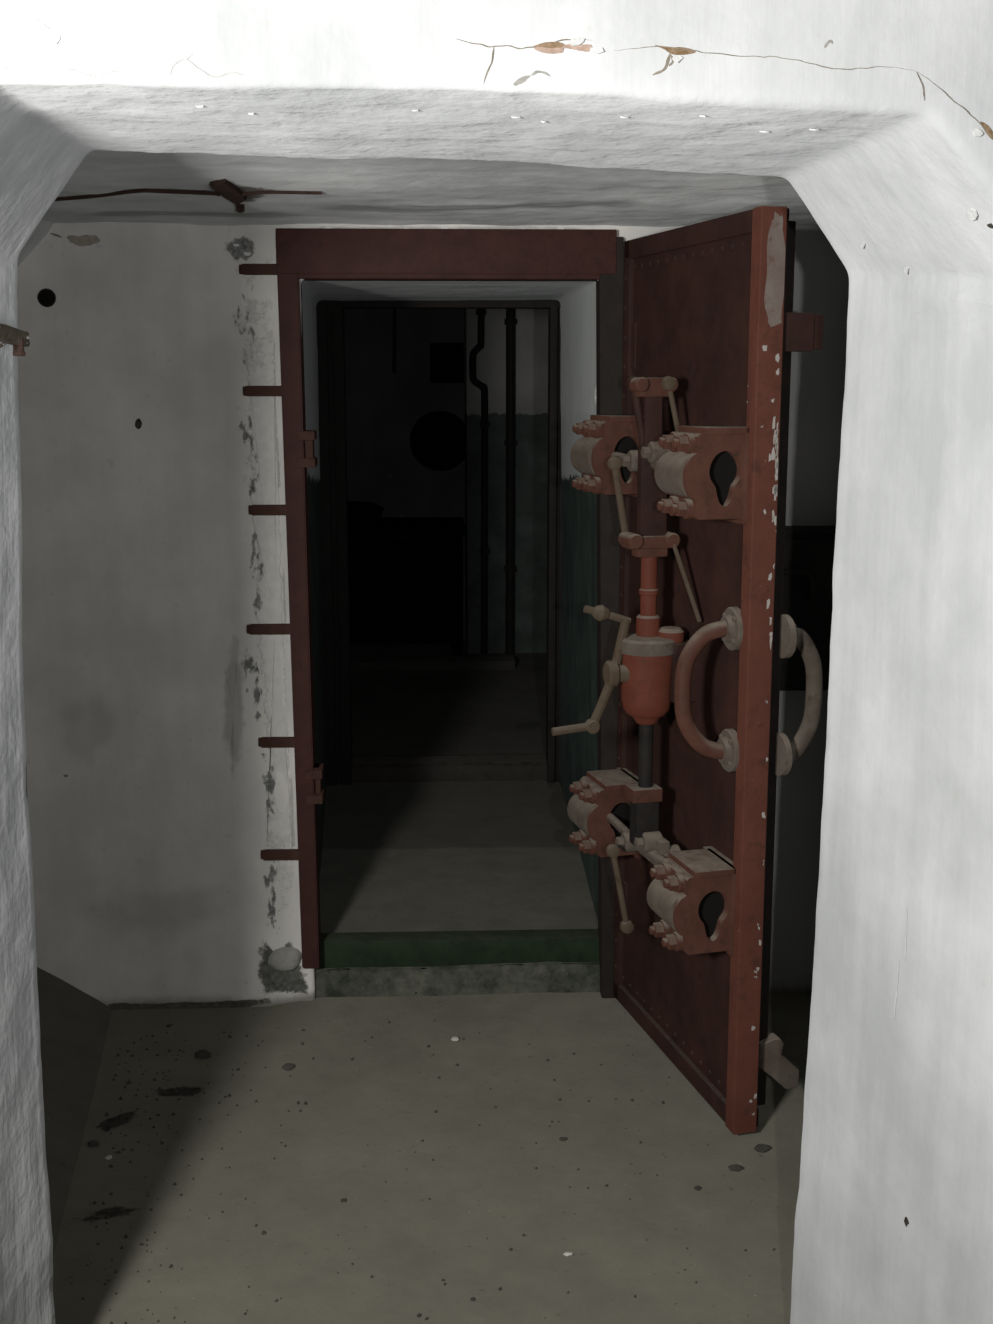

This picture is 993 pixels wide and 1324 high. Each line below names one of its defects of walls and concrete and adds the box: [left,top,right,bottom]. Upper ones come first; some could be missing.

crack [458,39,586,82]
crack [618,46,993,138]
flaking render [227,236,254,260]
flaking render [235,296,292,849]
flaking render [264,865,284,927]